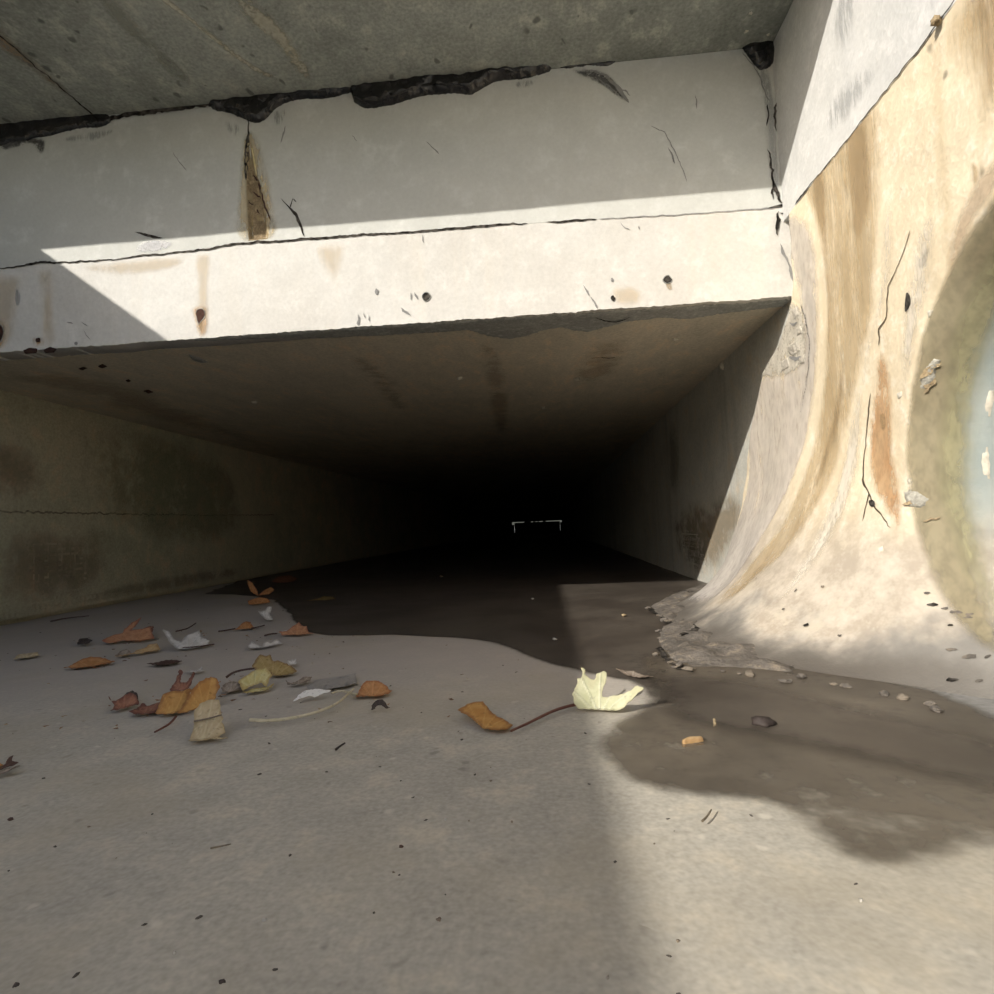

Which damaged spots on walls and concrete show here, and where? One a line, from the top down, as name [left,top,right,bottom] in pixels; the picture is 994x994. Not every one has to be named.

spalling [246,138,270,241]
crack [0,0,954,280]
corrosion [732,117,873,595]
crack [878,231,910,345]
crack [862,398,891,528]
corrosion [872,360,897,515]
water stain [206,539,994,860]